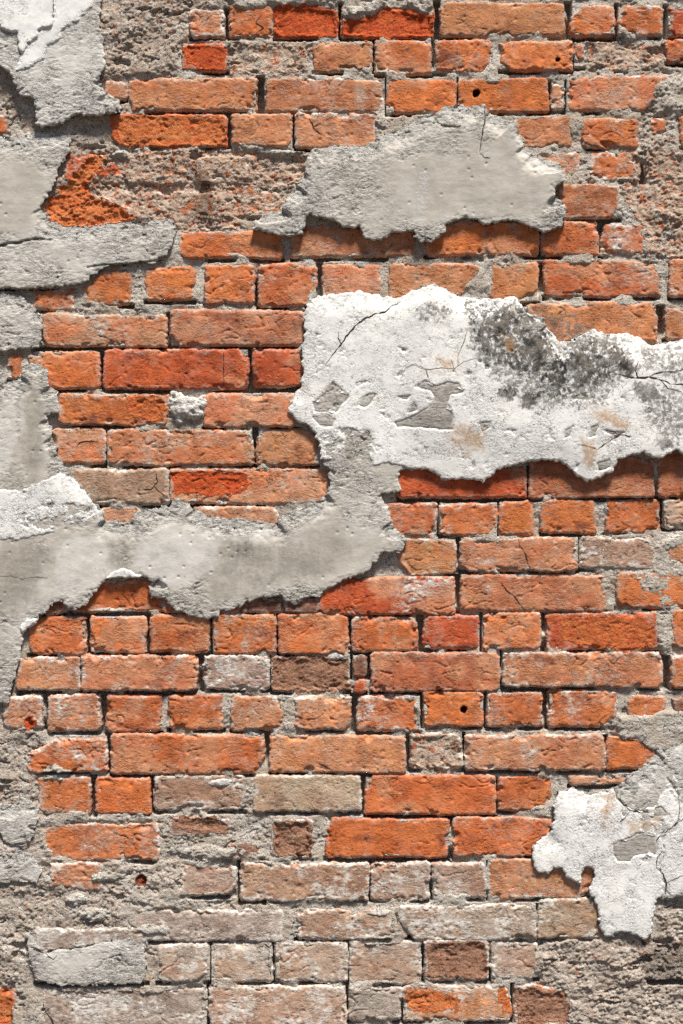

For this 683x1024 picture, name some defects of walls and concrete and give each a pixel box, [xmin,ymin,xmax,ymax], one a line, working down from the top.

flaking render [0,0,567,352]
crack [434,110,489,158]
flaking render [0,284,683,704]
crack [326,301,401,363]
leakage [464,300,683,450]
flaking render [497,738,683,1024]